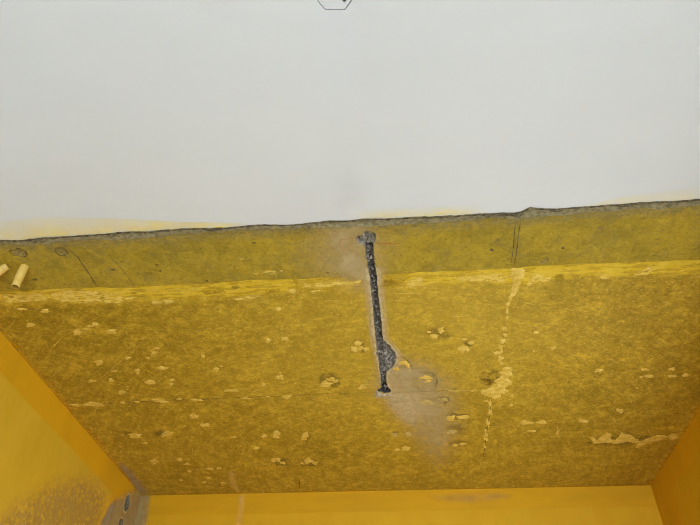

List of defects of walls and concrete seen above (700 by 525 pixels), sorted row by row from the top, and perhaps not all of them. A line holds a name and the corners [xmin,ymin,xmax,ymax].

crack [0,199,700,287]
spalling [0,199,700,407]
water stain [318,227,450,455]
peeling [590,432,678,448]